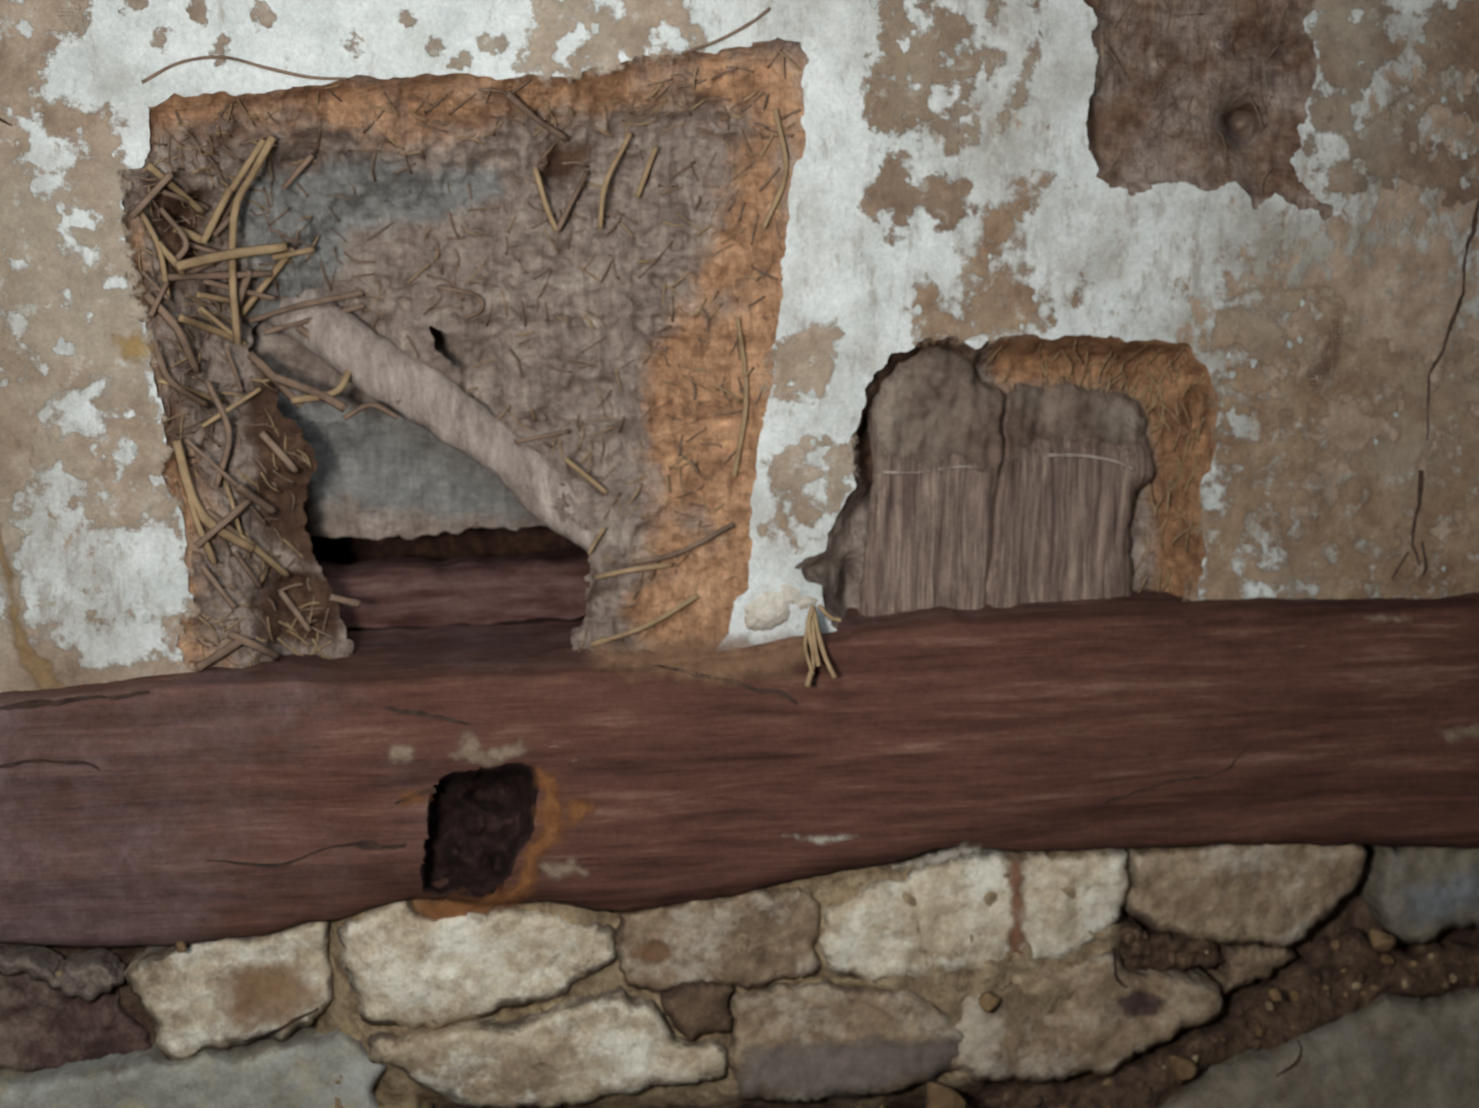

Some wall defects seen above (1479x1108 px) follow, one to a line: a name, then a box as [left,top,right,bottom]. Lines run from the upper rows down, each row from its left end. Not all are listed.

spalling [0,0,1479,693]
crack [1392,199,1479,581]
crack [0,759,100,771]
crack [0,691,150,710]
corrosion [415,771,593,922]